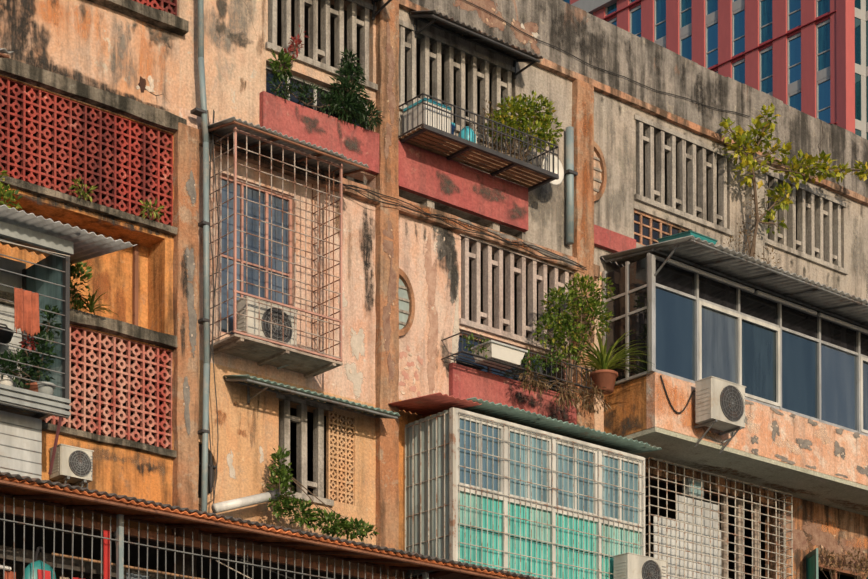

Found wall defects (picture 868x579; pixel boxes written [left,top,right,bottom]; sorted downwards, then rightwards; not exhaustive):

water stain [0,0,171,110]
water stain [551,14,609,70]
water stain [691,75,726,117]
peeling [771,407,796,441]
peeling [796,438,812,450]
peeling [834,428,860,460]